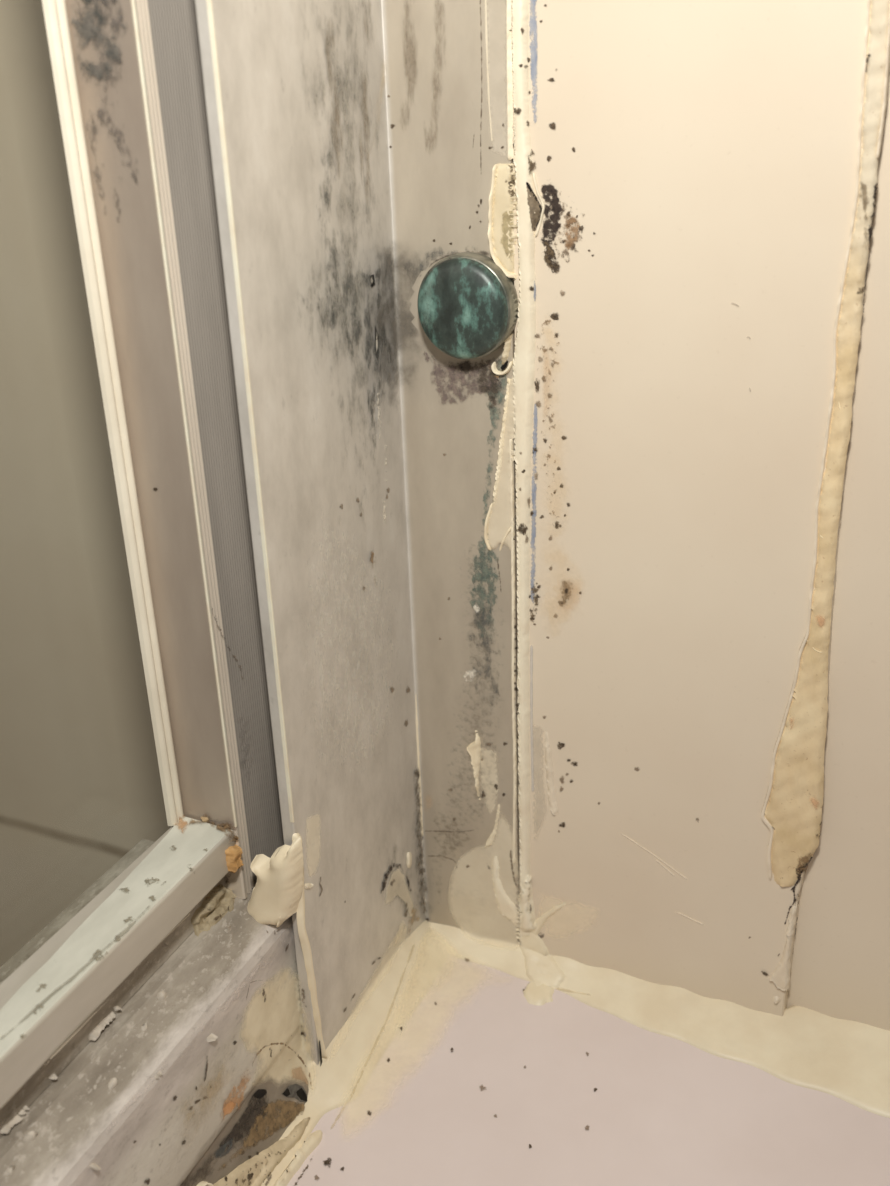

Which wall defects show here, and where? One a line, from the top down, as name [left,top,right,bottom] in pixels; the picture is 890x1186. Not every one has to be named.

water stain [501,211,513,256]
water stain [541,184,595,273]
water stain [318,239,457,419]
water stain [426,353,506,440]
water stain [515,313,570,625]
water stain [470,491,498,675]
water stain [554,568,581,618]
water stain [514,609,546,791]
crack [761,889,799,976]